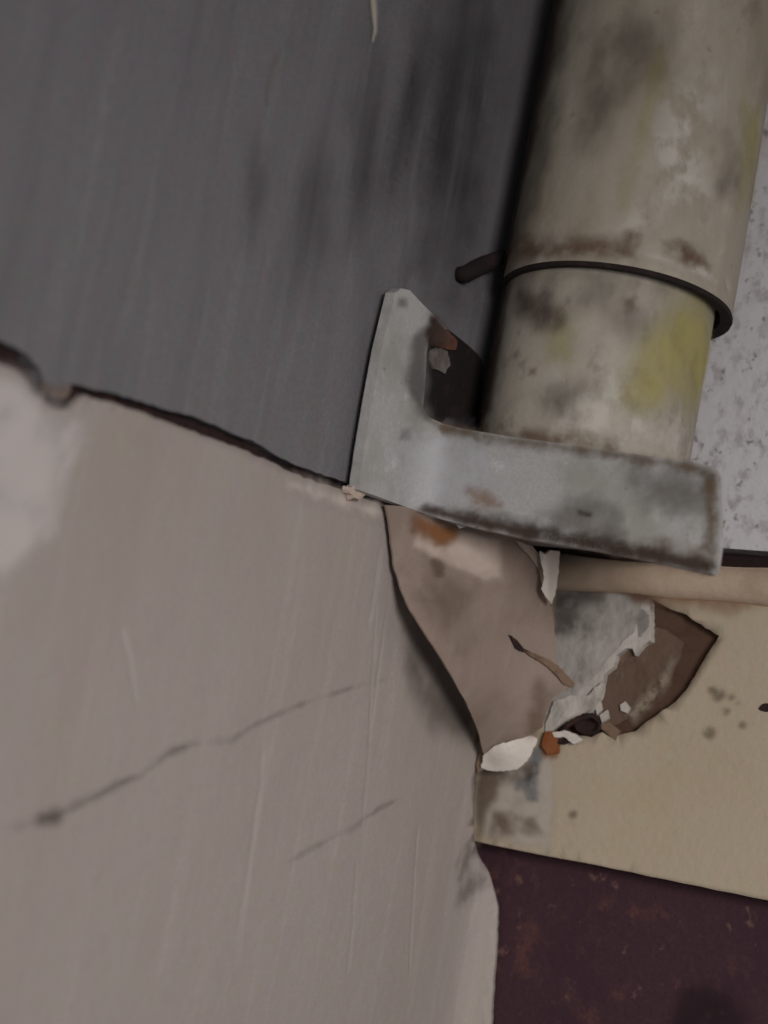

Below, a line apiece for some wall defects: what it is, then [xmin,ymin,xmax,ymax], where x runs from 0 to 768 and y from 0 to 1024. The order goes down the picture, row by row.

corrosion [428,317,457,350]
corrosion [440,242,733,434]
spalling [544,591,719,740]